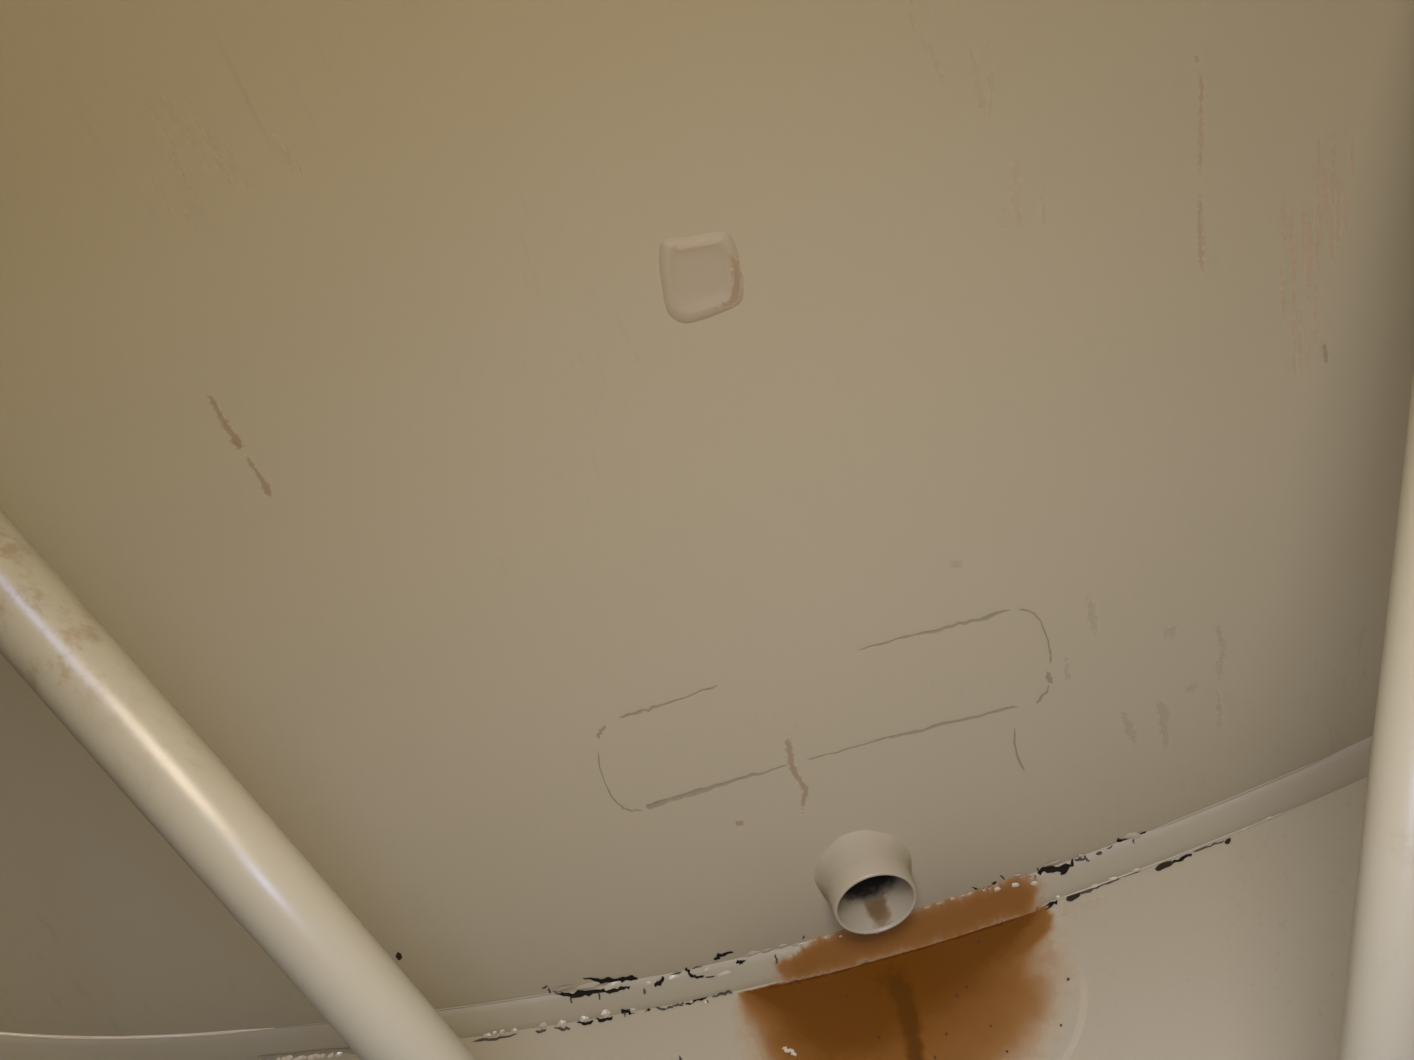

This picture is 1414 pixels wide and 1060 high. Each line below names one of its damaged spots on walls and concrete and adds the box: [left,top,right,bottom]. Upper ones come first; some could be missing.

corrosion [738,873,1070,1060]